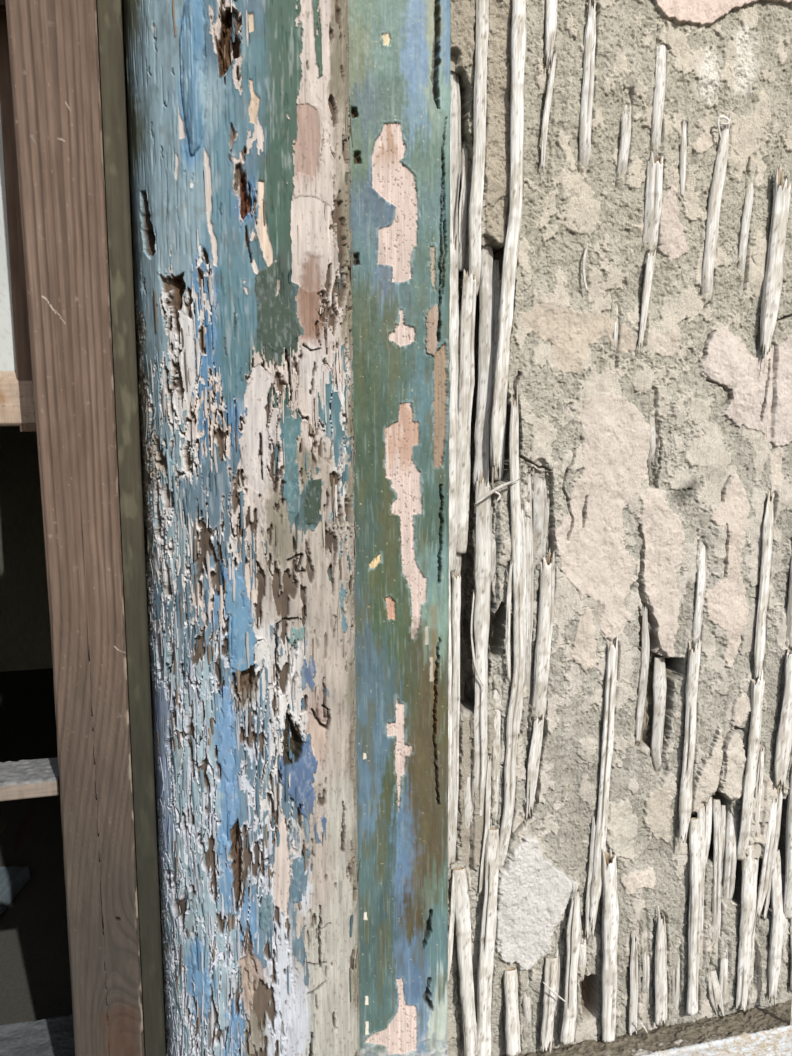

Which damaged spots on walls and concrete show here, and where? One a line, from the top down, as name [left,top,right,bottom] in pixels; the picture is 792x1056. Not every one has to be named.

peeling [345,98,419,283]
flaking render [450,0,512,293]
peeling [122,0,360,1056]
peeling [385,402,428,639]
spalling [450,290,498,871]
crack [513,371,589,582]
flaking render [530,393,685,859]
crack [630,526,660,654]
crack [647,420,664,489]
flaking render [701,327,792,488]
crack [421,909,433,951]
crack [423,977,434,1013]